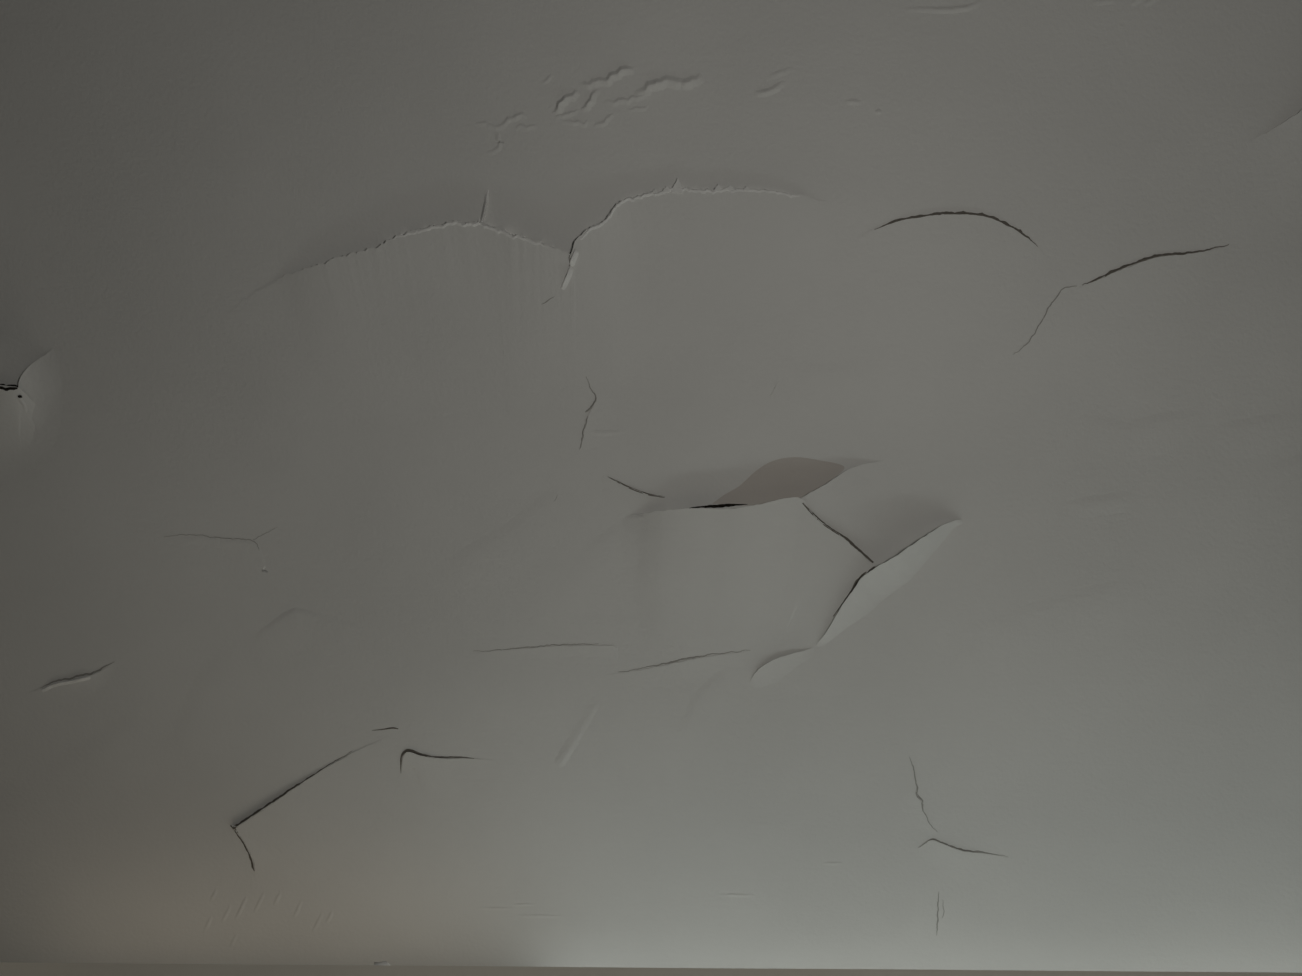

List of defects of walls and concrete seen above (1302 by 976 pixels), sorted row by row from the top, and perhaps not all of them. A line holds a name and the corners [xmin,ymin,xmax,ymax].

peeling [602,457,963,689]
crack [14,662,116,702]
crack [231,727,497,884]